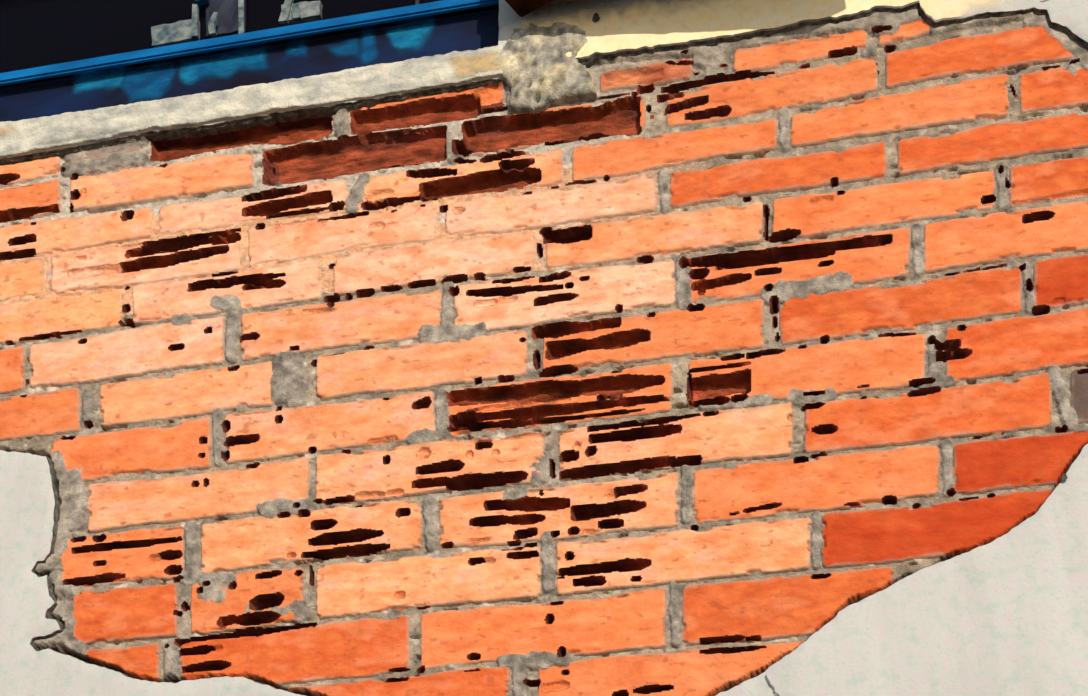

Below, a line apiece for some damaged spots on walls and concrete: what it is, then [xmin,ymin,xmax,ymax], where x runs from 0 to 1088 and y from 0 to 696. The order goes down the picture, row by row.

spalling [679,234,893,295]
spalling [686,361,751,408]
spalling [446,374,670,432]
spalling [587,413,701,444]
spalling [412,470,528,492]
spalling [559,455,702,481]
spalling [483,496,570,512]
spalling [570,499,647,521]
spalling [71,534,182,554]
spalling [557,558,652,587]
spalling [217,592,285,627]
spalling [185,622,317,643]